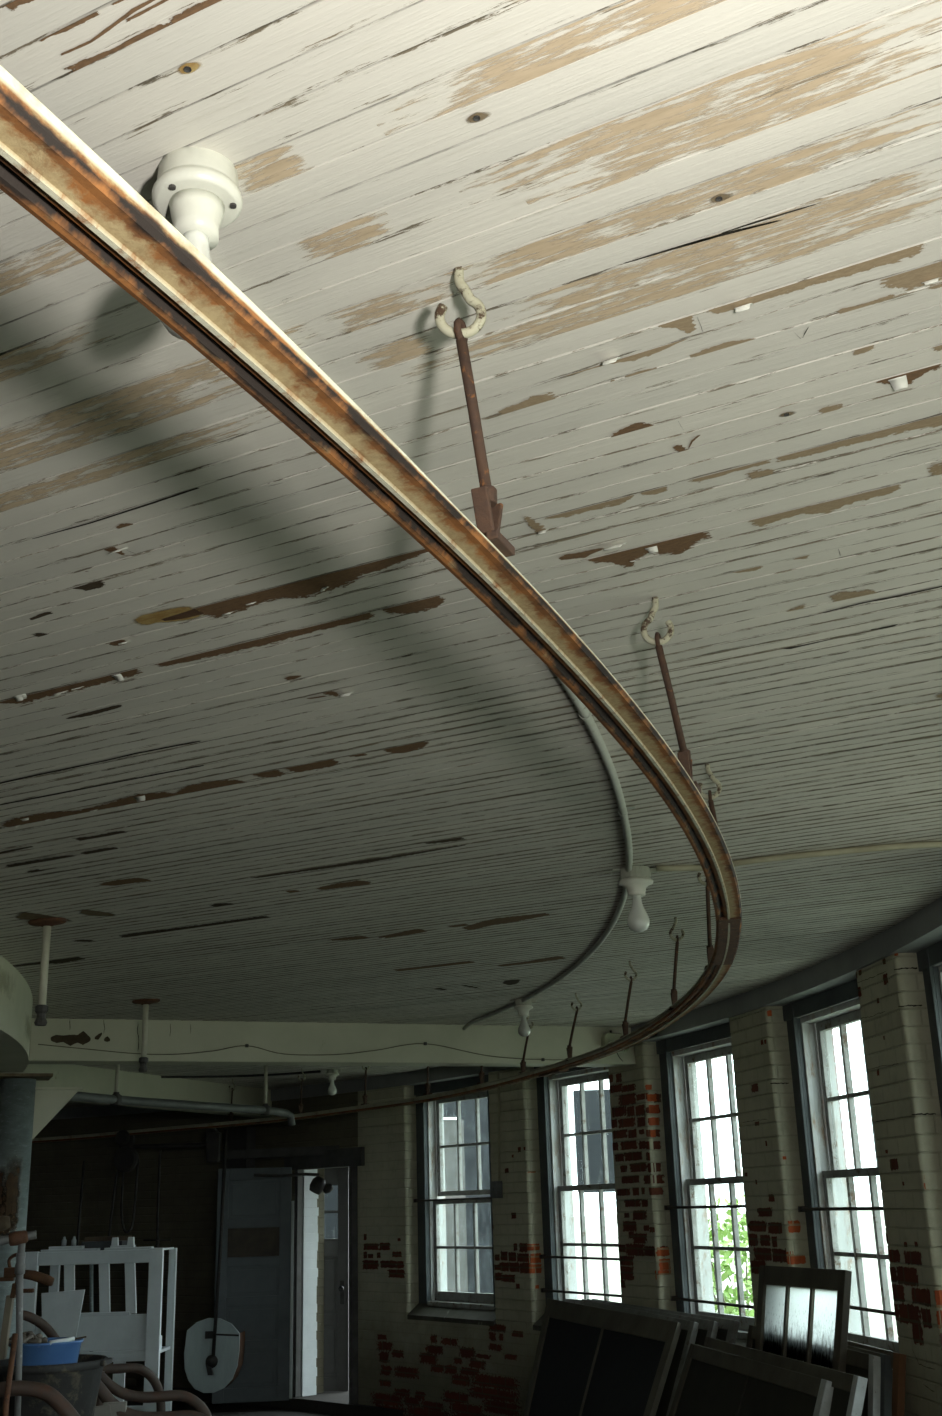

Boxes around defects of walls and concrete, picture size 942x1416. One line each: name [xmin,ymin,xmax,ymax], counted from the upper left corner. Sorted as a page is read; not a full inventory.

peeling [2,0,34,11]
peeling [41,0,222,74]
corrosion [179,63,200,74]
peeling [435,0,942,204]
peeling [330,103,942,382]
peeling [749,484,901,527]
peeling [195,549,429,620]
peeling [559,532,712,568]
peeling [0,742,429,829]
peeling [609,1073,671,1288]
peeling [745,1173,806,1275]
peeling [885,1232,942,1346]